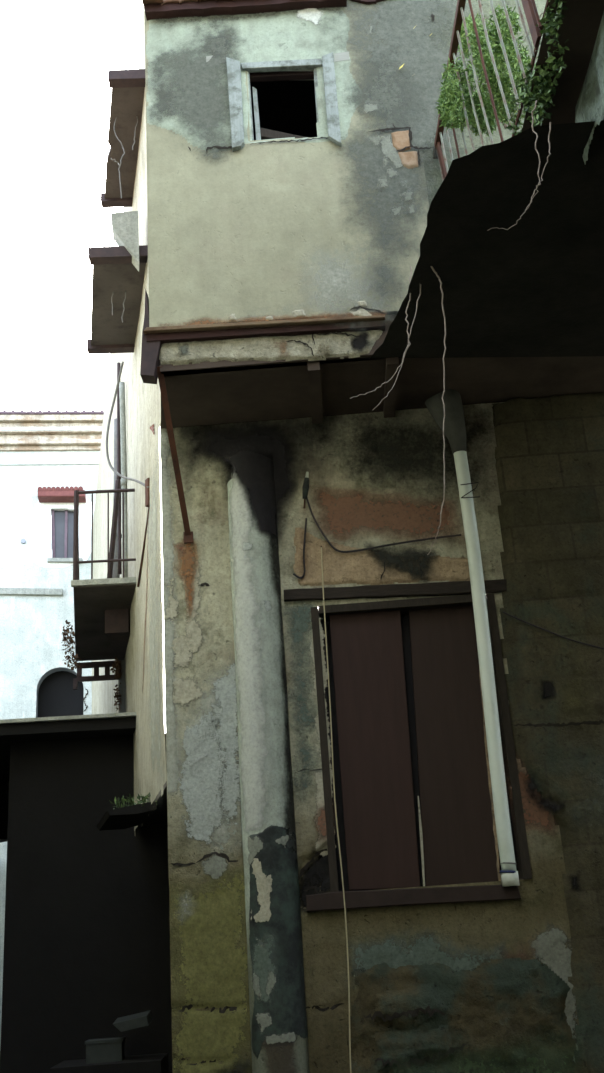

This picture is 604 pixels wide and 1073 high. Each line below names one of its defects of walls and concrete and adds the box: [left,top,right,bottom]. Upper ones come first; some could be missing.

leakage [150,0,467,311]
spalling [369,130,418,217]
corrosion [178,543,197,614]
peeling [164,561,241,879]
peeling [248,618,336,1059]
leakage [353,933,522,972]